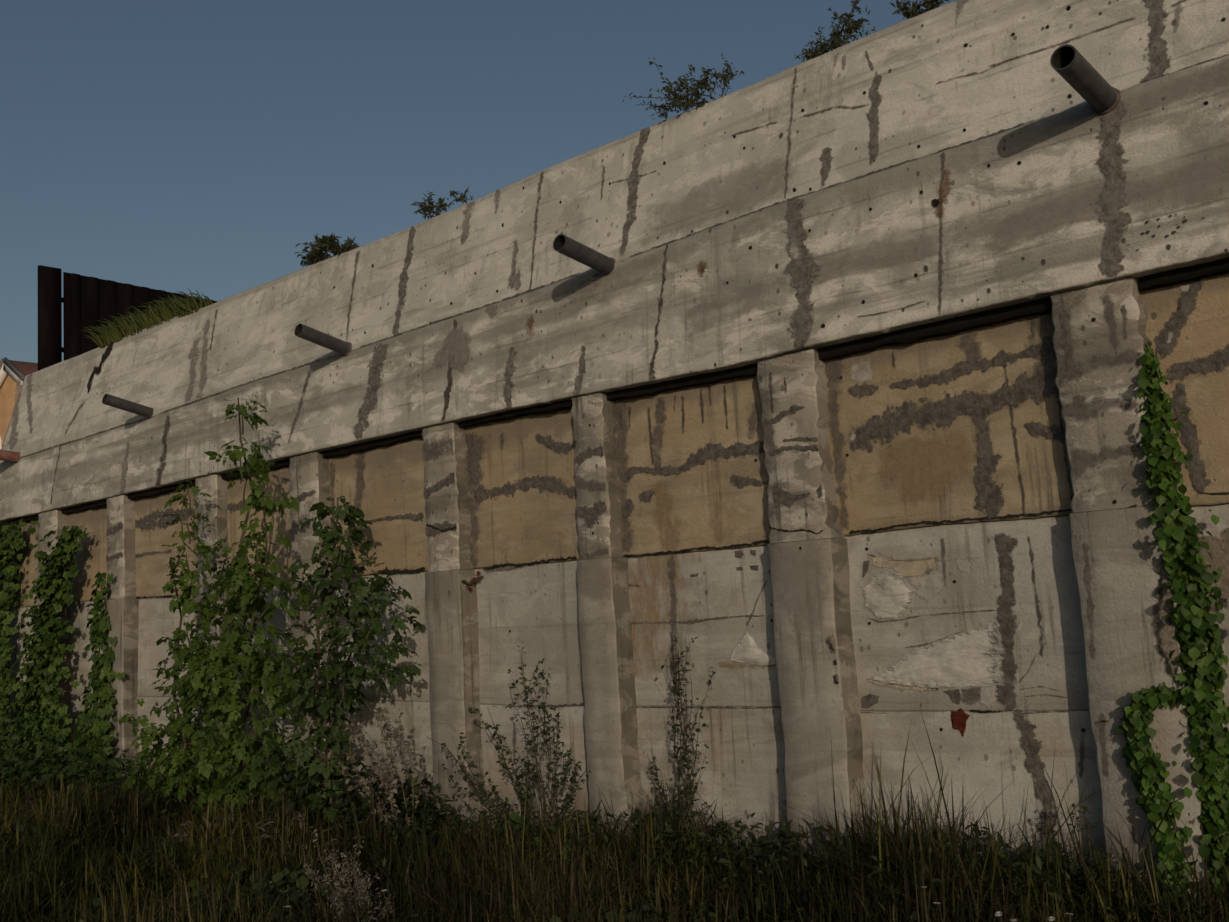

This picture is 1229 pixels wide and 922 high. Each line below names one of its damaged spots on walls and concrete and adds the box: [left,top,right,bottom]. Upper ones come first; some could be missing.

peeling [862,554,945,599]
peeling [861,622,1002,708]
rust [951,708,970,737]